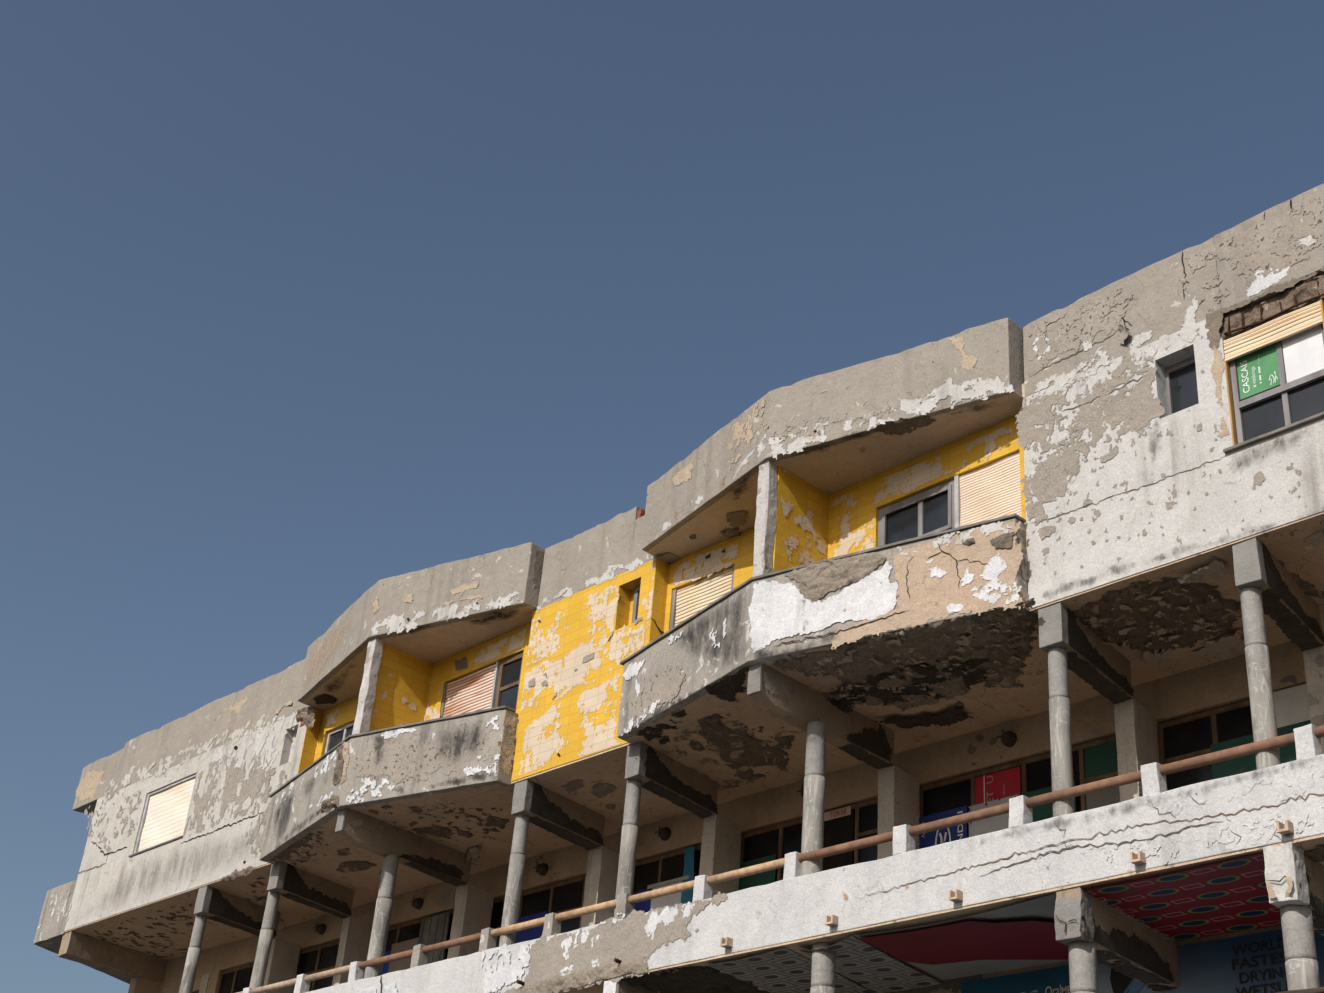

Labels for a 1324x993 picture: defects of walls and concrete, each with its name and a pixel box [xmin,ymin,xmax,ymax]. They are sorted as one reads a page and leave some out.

peeling [672,459,693,486]
peeling [727,194,1324,729]
peeling [671,511,749,586]
crack [777,544,989,646]
peeling [76,551,795,906]
spalling [84,904,194,958]
peeling [481,891,770,993]
crack [856,793,1324,898]
peeling [1266,845,1324,934]